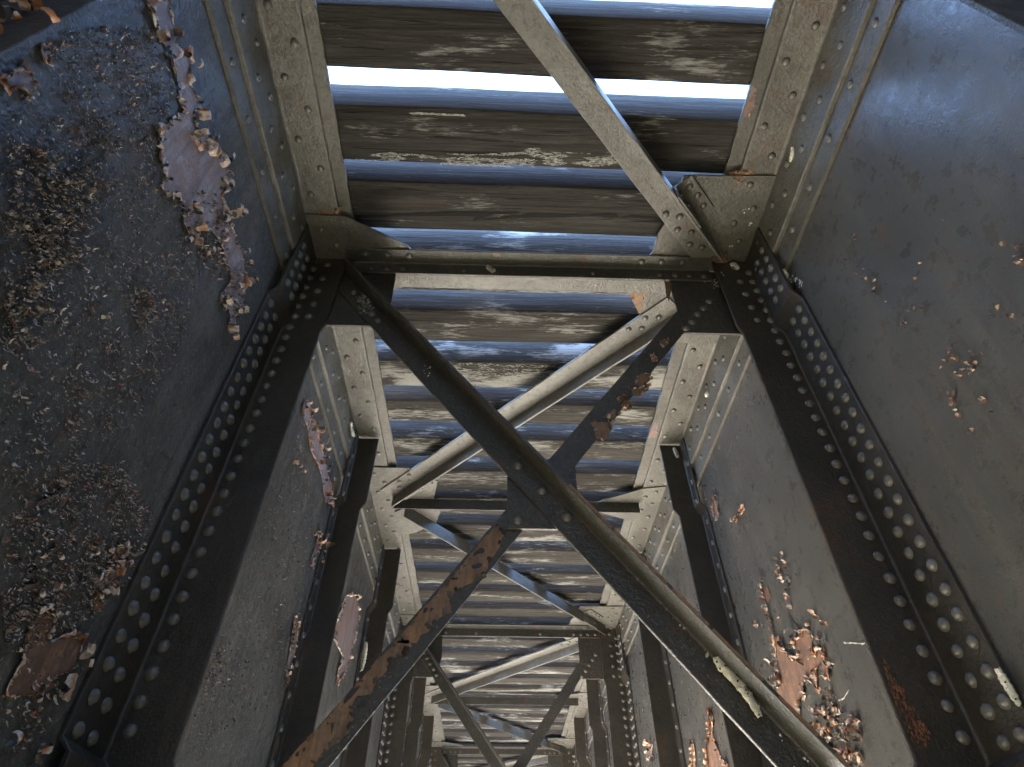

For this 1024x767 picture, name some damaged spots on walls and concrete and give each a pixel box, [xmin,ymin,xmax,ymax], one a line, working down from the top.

peeling [0,0,259,765]
rust [590,337,669,442]
peeling [188,399,336,761]
peeling [334,592,363,687]
rust [282,524,506,767]
peeling [751,551,834,715]
peeling [688,708,728,767]